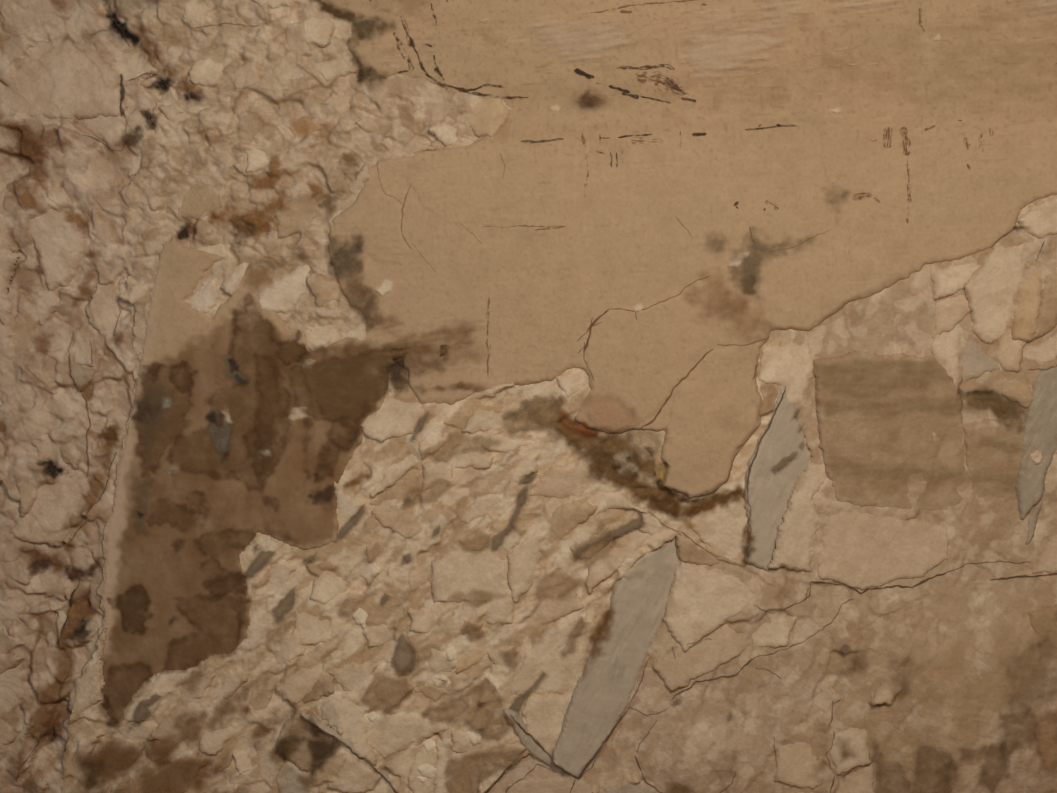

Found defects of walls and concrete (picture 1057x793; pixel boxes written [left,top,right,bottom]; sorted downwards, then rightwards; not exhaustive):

crack [84,73,156,154]
water stain [125,111,156,146]
water stain [109,13,201,100]
water stain [203,297,472,504]
spalling [0,0,752,793]
rust [504,395,744,527]
crack [642,337,768,427]
crack [649,386,786,566]
rust [743,527,753,562]
spalling [466,195,1057,793]
water stain [960,389,1022,426]
crack [486,561,1057,793]